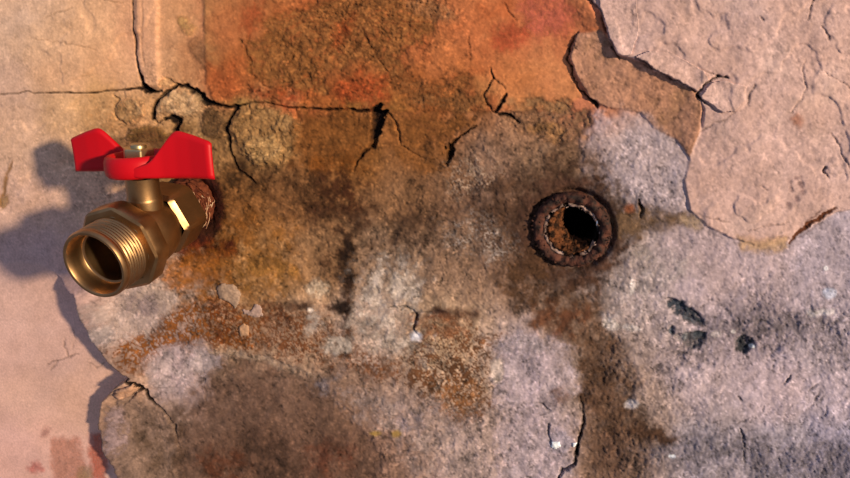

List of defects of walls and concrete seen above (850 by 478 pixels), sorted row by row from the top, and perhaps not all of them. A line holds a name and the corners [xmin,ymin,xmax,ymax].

crack [49,4,256,183]
spalling [156,78,299,167]
crack [267,102,396,168]
flaking render [600,0,747,112]
rust [162,179,237,285]
rust [547,205,591,256]
spalling [789,208,836,244]
rust [112,300,501,428]
water stain [458,153,689,478]
spalling [667,298,708,354]
water stain [823,288,836,298]
crack [558,401,585,478]